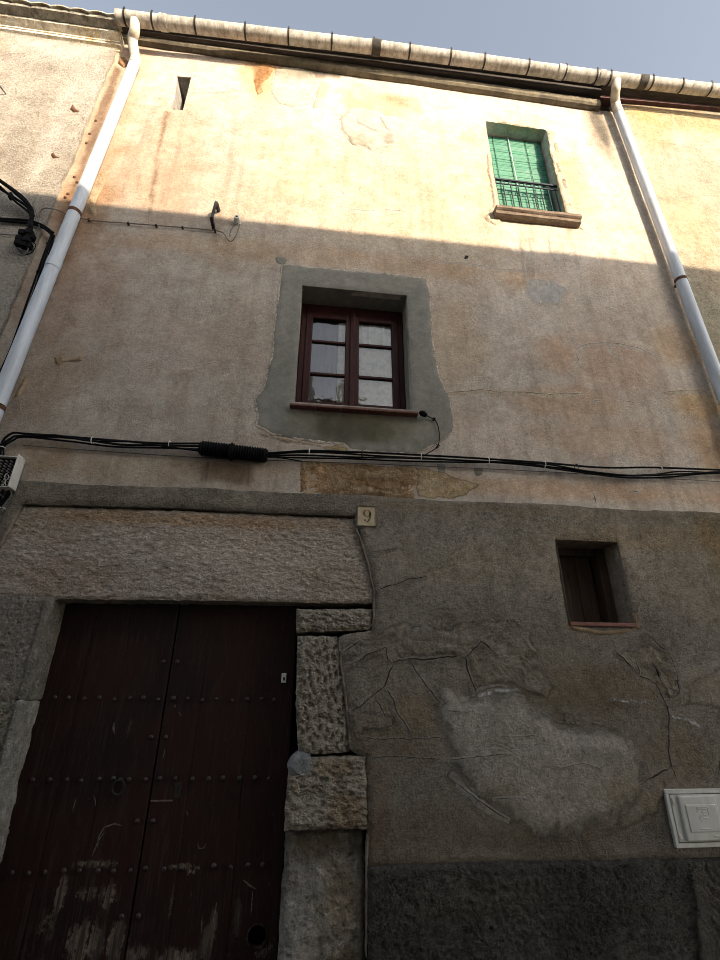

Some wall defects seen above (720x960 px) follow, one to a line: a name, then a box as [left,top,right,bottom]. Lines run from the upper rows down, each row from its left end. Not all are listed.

spalling [300,461,418,499]
crack [340,639,496,737]
crack [612,632,683,790]
crack [455,781,510,824]